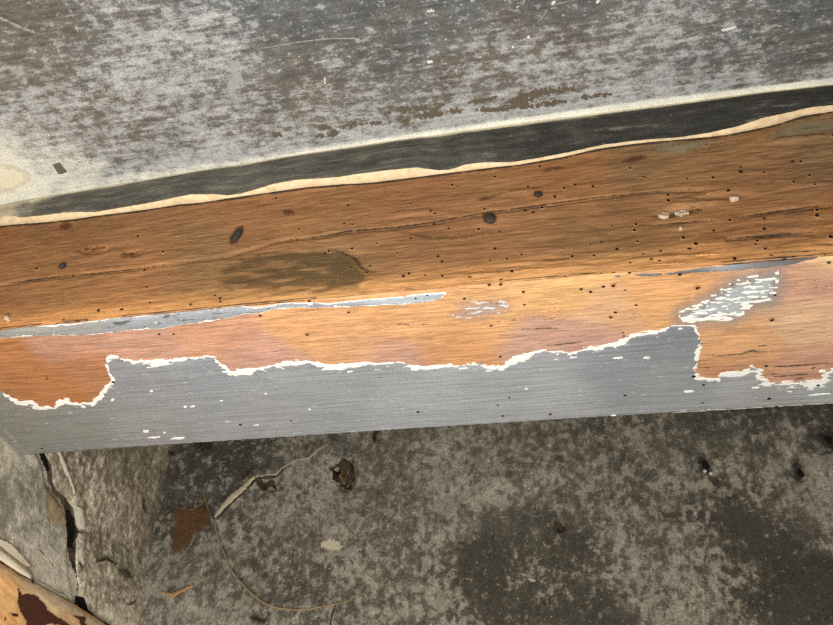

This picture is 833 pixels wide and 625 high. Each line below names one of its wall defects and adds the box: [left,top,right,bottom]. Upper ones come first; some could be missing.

peeling [0,257,833,455]
crack [39,453,79,591]
water stain [662,506,833,625]